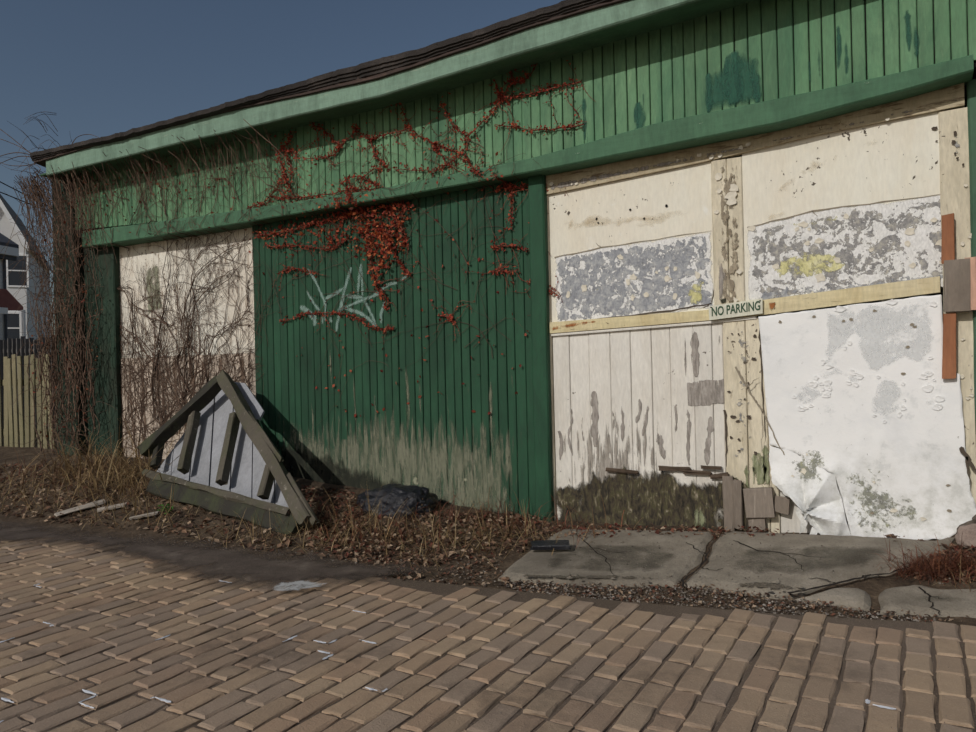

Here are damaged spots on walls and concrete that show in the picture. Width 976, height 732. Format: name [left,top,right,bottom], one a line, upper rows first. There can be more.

peeling [549,142,943,322]
water stain [277,442,396,489]
crack [681,540,942,616]